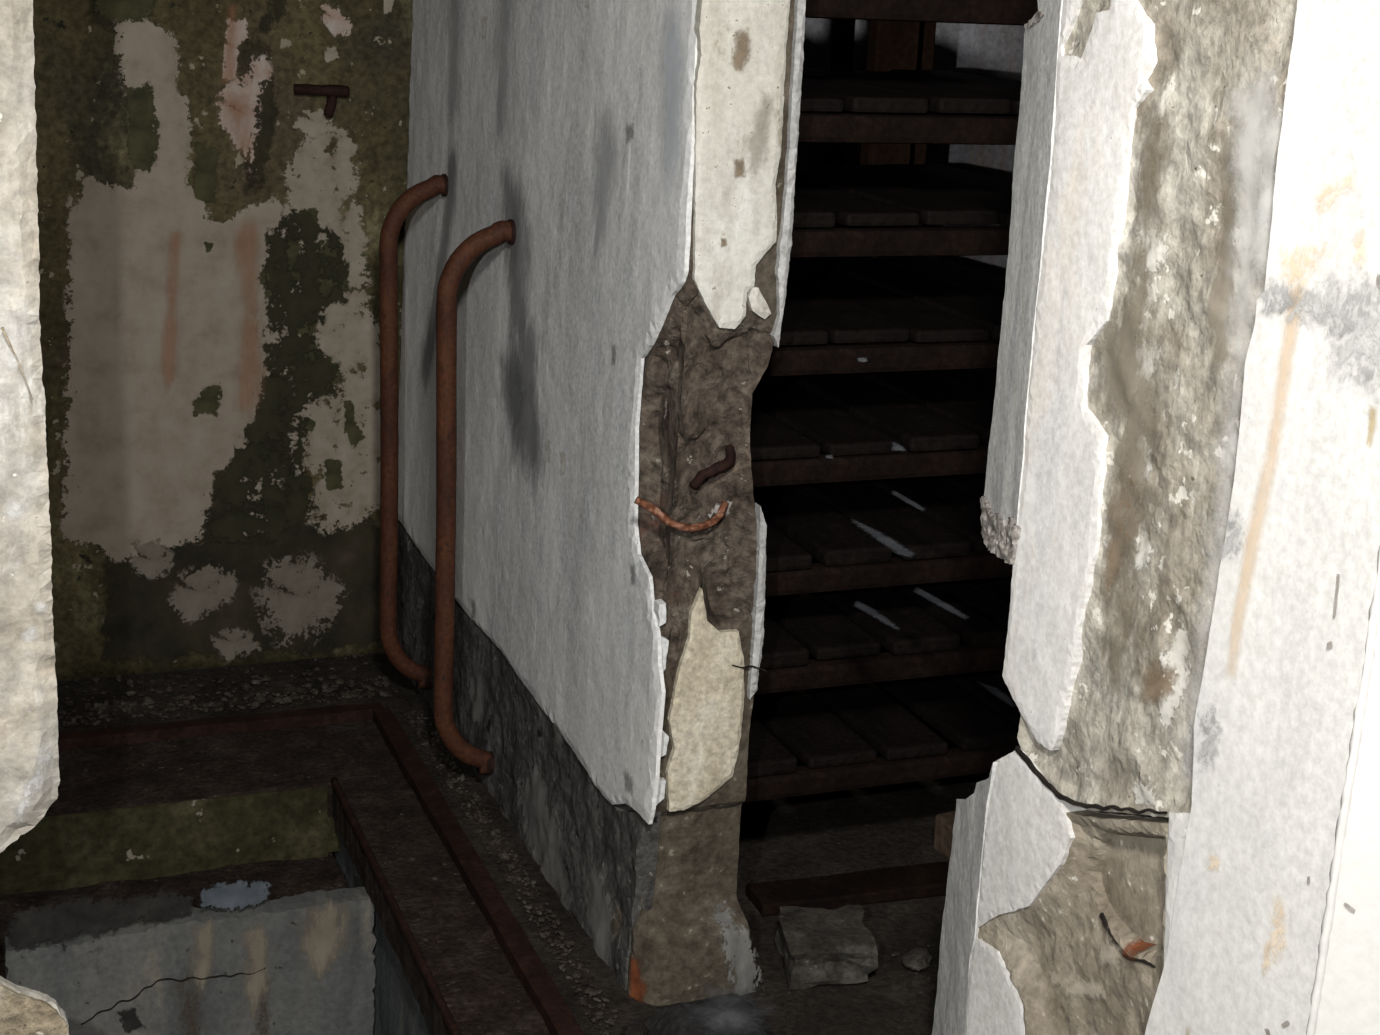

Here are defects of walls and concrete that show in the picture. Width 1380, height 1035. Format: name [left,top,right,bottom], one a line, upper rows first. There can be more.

spalling [631,272,774,682]
rust [1233,256,1310,637]
spalling [978,0,1298,1035]
flaking render [661,730,669,757]
flaking render [656,777,666,806]
crack [1015,746,1167,814]
flaking render [0,983,69,1035]